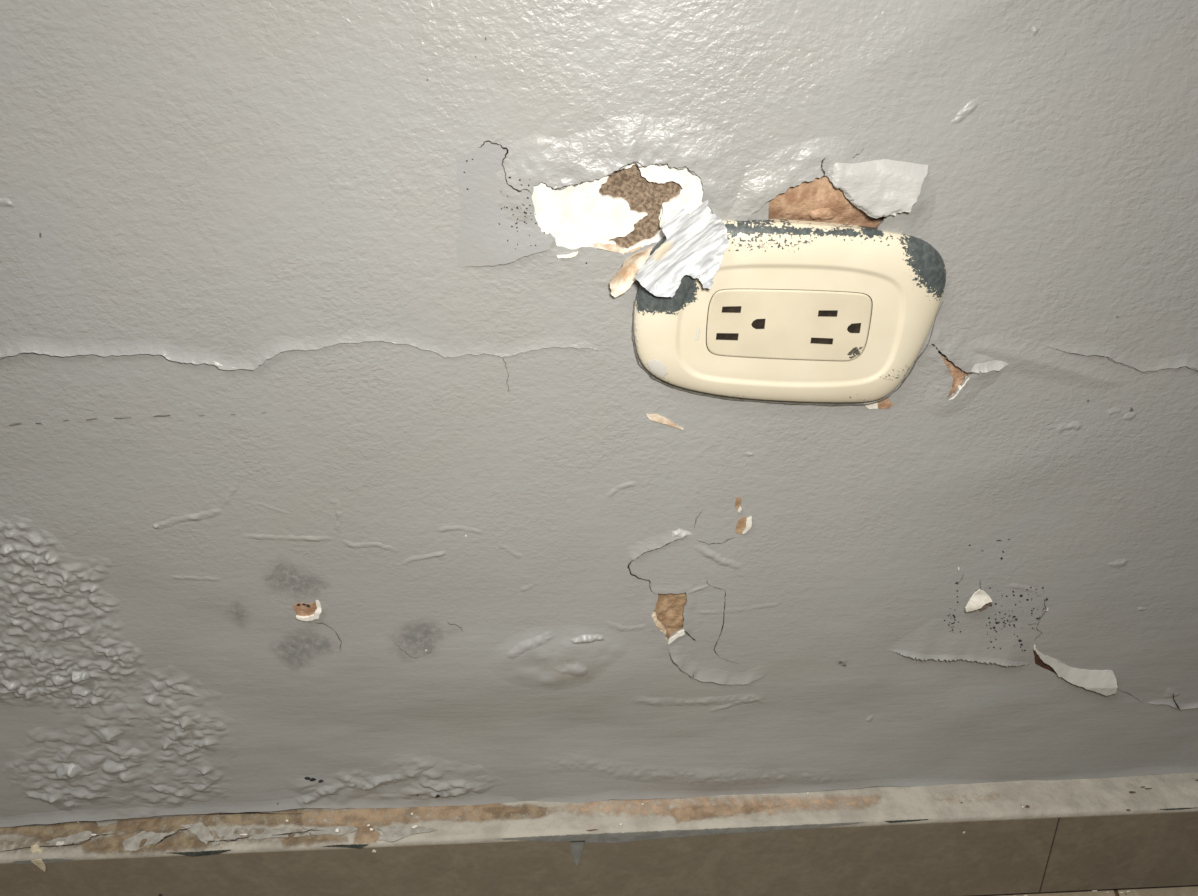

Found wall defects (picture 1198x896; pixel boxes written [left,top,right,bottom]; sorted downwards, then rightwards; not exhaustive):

peeling [456,114,936,297]
flaking render [292,600,322,621]
peeling [627,497,784,685]
peeling [888,566,1118,696]